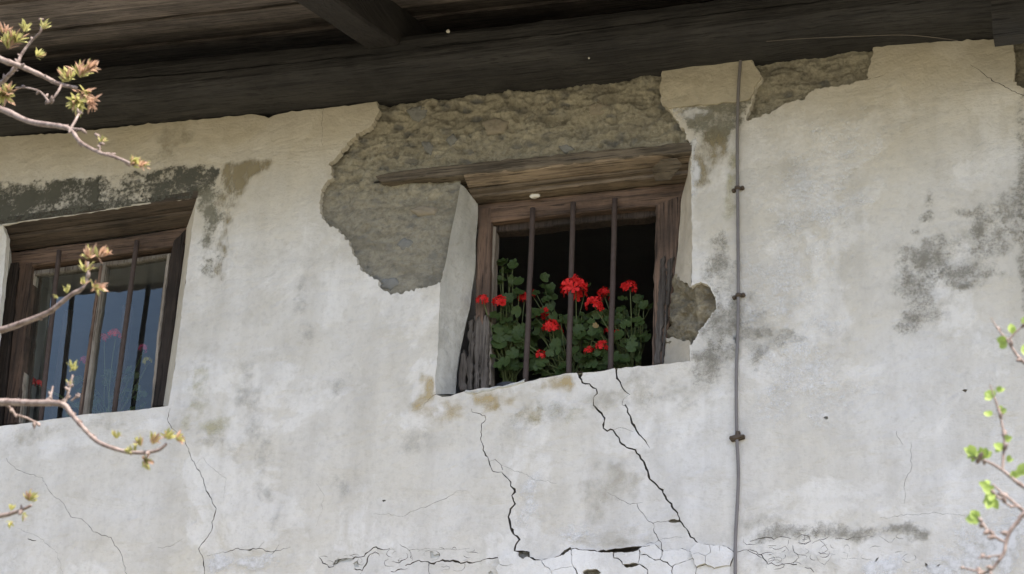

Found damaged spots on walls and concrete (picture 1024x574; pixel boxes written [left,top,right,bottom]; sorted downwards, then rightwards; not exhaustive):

flaking render [747,51,873,121]
leakage [0,160,270,254]
flaking render [322,75,688,295]
leakage [673,99,751,192]
flaking render [665,274,716,345]
crack [6,458,127,574]
crack [402,367,764,574]